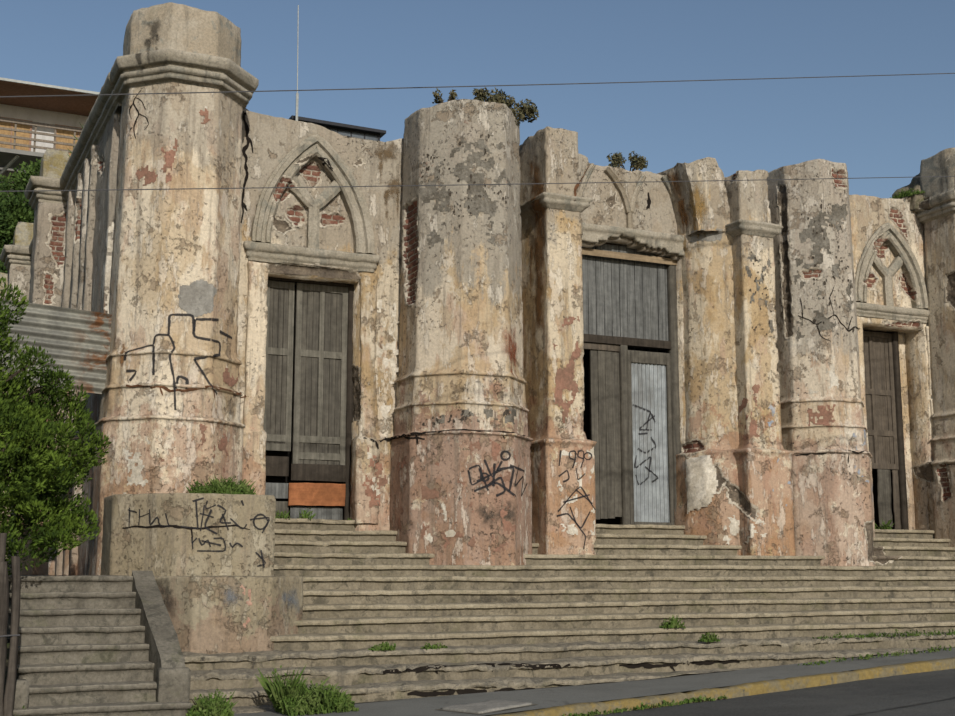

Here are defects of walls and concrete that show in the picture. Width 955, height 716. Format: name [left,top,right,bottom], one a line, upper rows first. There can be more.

crack [128,90,149,139]
peeling [136,138,179,186]
crack [241,106,253,223]
flaking render [270,154,348,236]
flaking render [42,196,82,305]
flaking render [375,132,516,426]
flaking render [746,182,912,341]
crack [798,285,861,341]
flaking render [898,268,920,306]
flaking render [945,270,955,311]
flaking render [352,363,361,422]
flaking render [712,462,767,545]